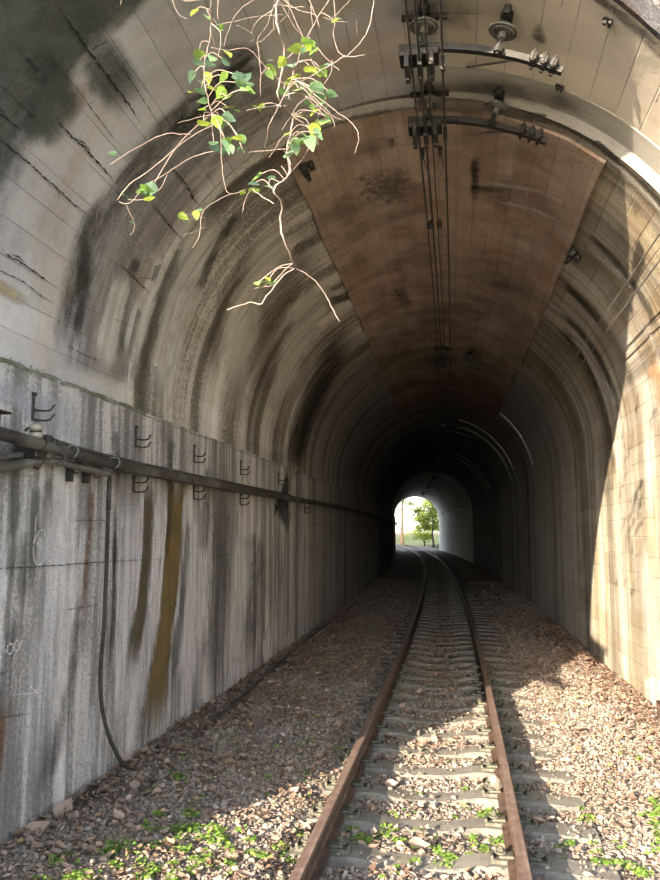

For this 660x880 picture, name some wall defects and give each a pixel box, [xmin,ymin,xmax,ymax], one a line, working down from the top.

crack [0,85,113,217]
crack [10,40,121,145]
crack [59,8,161,127]
damp [65,47,252,333]
damp [96,259,163,366]
damp [151,217,239,403]
damp [211,233,350,404]
damp [288,341,344,467]
damp [0,473,36,664]
damp [25,495,93,747]
rust [129,487,187,713]
damp [178,472,211,678]